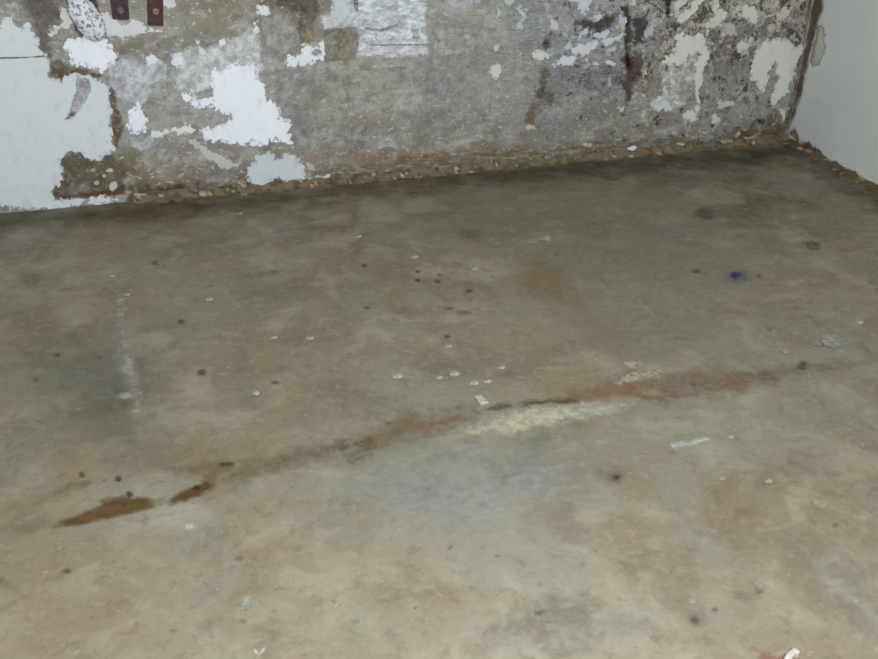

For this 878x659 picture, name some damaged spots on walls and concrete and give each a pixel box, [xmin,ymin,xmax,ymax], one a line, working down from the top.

peeling [492,0,526,30]
peeling [488,63,501,80]
rust [621,55,653,100]
peeling [532,0,834,161]
peeling [0,0,359,212]
rust [63,492,150,524]
rust [173,483,209,503]